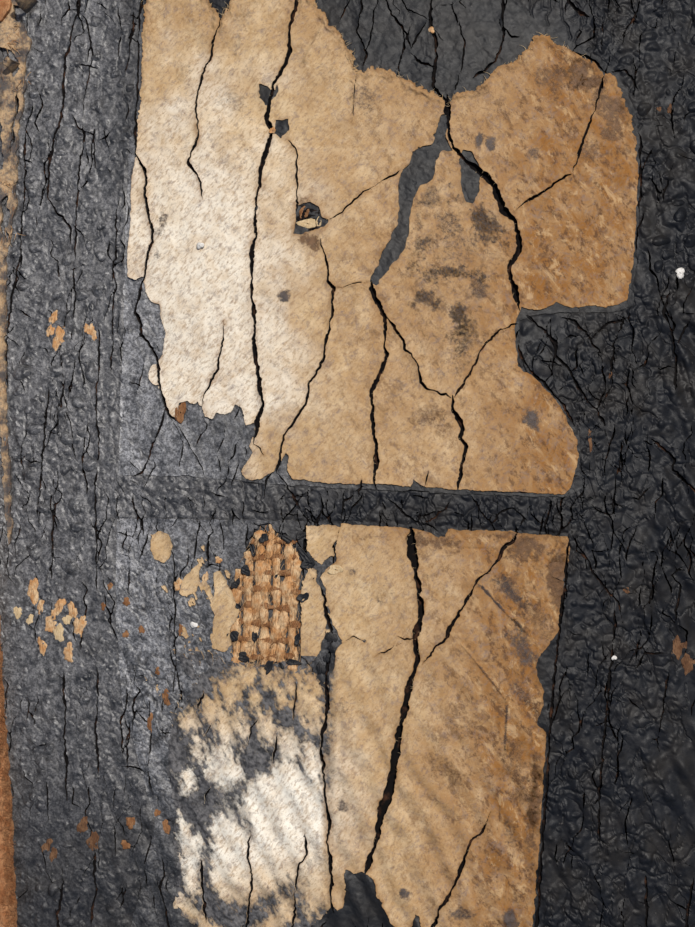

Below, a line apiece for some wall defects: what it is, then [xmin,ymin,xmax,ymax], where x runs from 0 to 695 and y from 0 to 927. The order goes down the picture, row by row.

crack [636,133,644,209]
crack [5,0,224,587]
peeling [148,364,159,388]
peeling [175,402,186,424]
crack [235,0,638,927]
crack [170,552,178,687]
peeling [225,524,315,675]
peeling [328,565,344,574]
crack [61,675,69,798]
crack [93,667,101,776]
leakage [161,650,334,927]
crack [200,862,208,919]